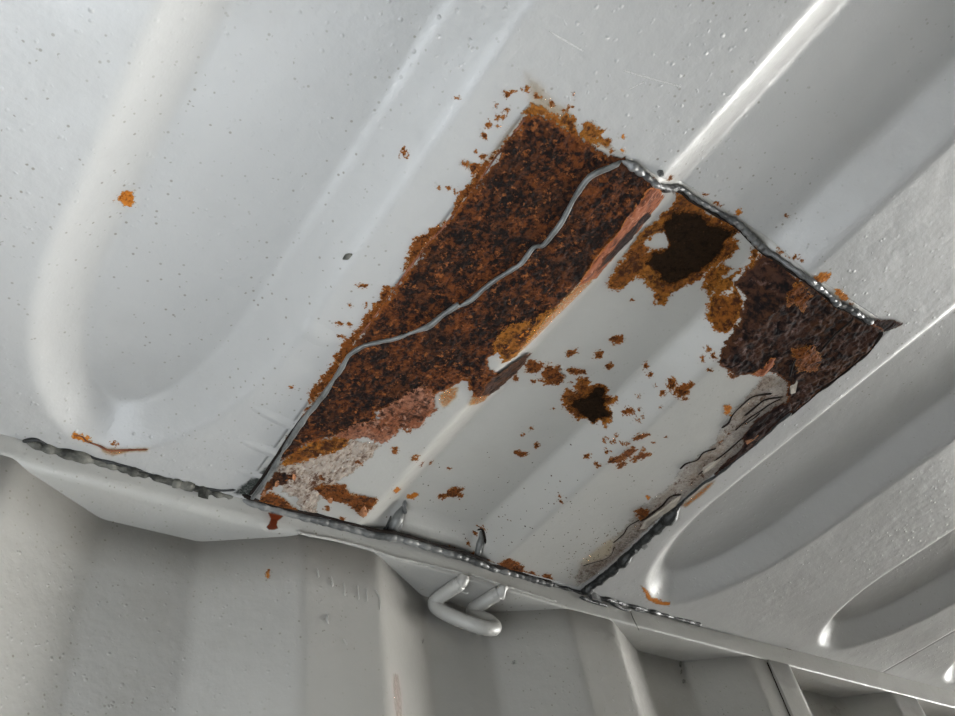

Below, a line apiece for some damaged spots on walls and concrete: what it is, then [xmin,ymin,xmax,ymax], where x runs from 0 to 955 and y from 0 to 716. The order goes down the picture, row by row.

corrosion [117,190,136,208]
corrosion [280,84,903,475]
corrosion [71,431,148,455]
peeling [259,437,400,521]
corrosion [430,486,467,531]
corrosion [448,505,631,581]
peeling [573,375,798,587]
corrosion [641,587,671,606]